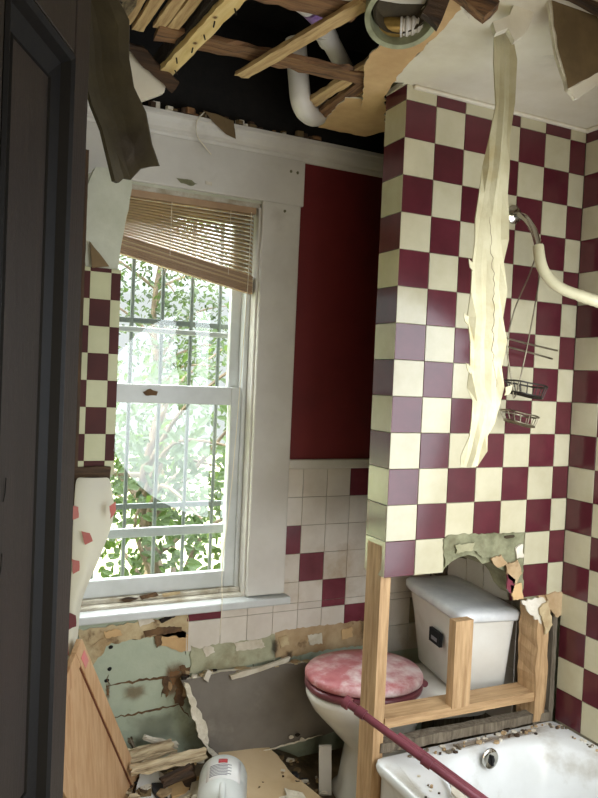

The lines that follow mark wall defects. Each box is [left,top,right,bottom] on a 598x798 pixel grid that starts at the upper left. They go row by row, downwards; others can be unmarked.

flaking render [129,51,165,102]
flaking render [443,532,563,635]
flaking render [78,615,364,706]